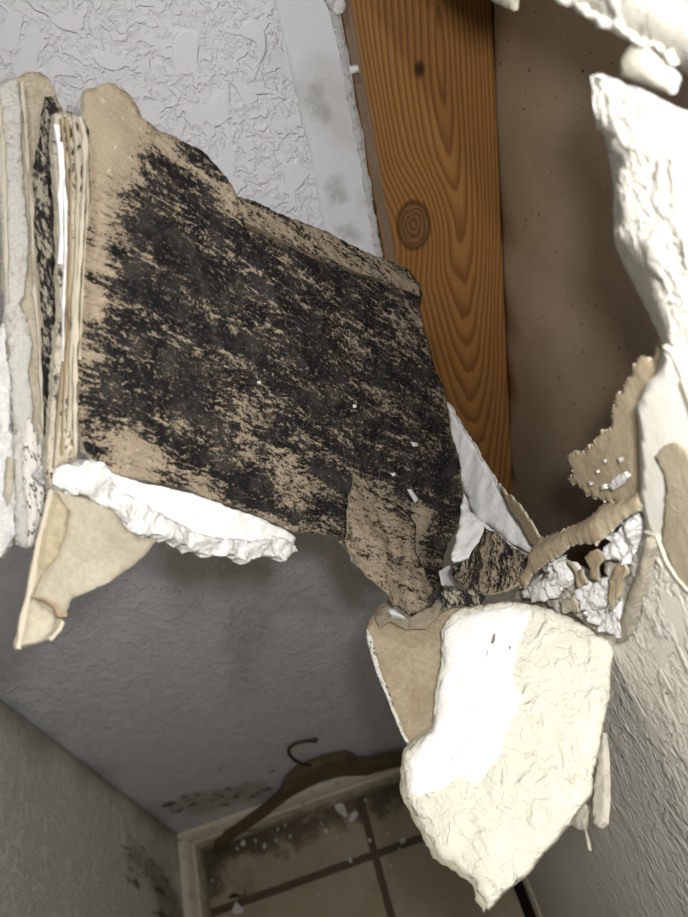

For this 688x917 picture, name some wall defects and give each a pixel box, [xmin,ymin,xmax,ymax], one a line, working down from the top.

spalling [555,0,678,66]
spalling [324,0,383,258]
spalling [32,459,298,565]
peeling [616,345,688,644]
leakage [430,588,488,614]
flaking render [409,606,532,797]
peeling [334,803,358,822]